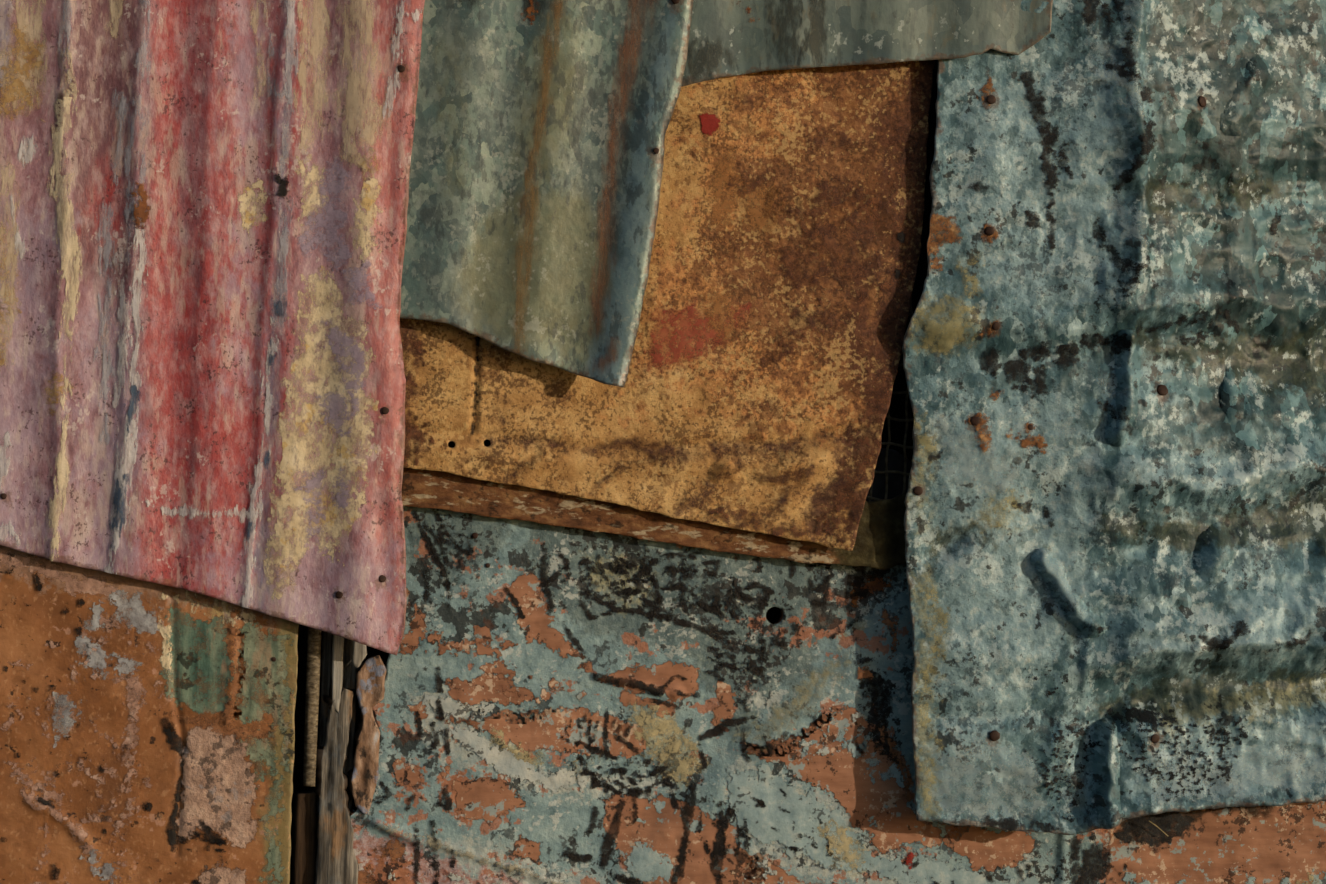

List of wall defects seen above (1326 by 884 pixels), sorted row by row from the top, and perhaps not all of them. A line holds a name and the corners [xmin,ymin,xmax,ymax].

rust [976,75,995,107]
rust [400,68,962,570]
rust [964,412,1048,454]
peeling [1011,499,1055,528]
peeling [1199,620,1251,650]
peeling [1265,630,1312,654]
spalling [0,522,296,884]
spalling [347,655,421,814]
peeling [398,573,1040,884]
peeling [1025,702,1326,884]
peeling [358,826,563,884]